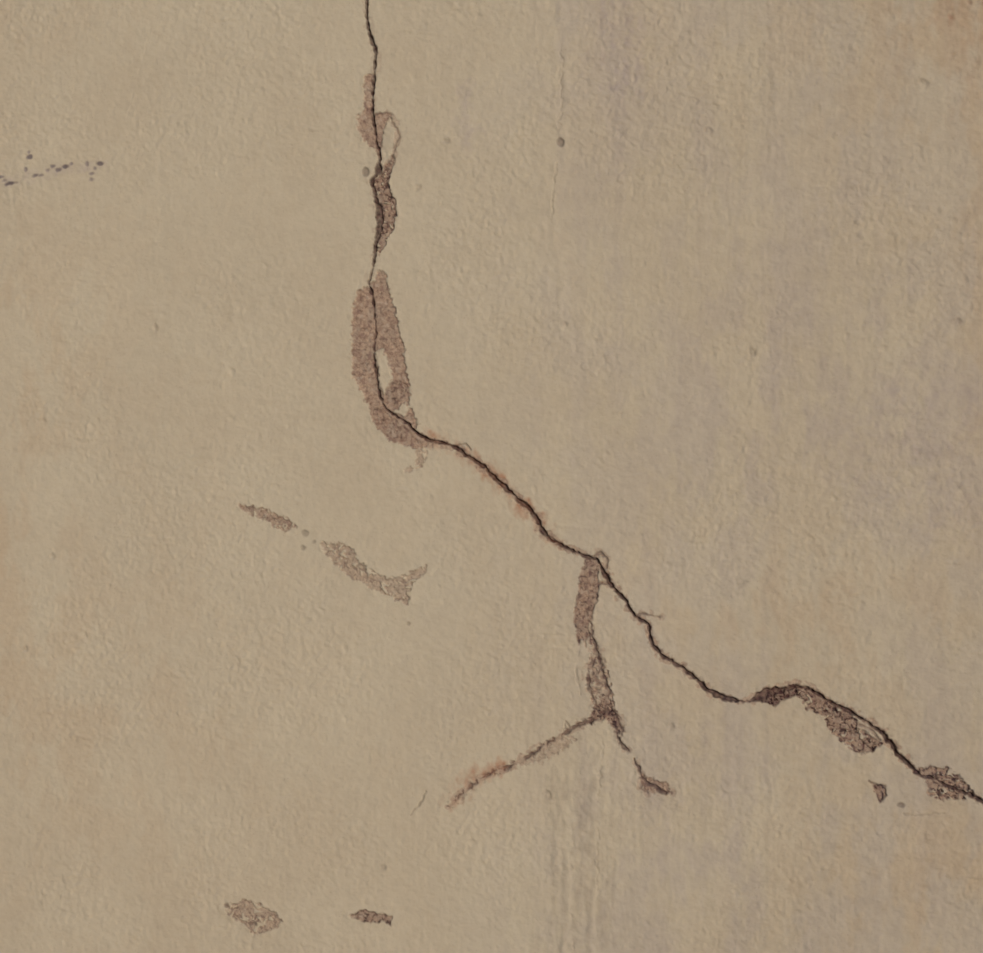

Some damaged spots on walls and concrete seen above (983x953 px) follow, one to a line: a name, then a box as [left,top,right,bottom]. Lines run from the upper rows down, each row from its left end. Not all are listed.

peeling [354,73,402,257]
spalling [348,269,429,475]
crack [360,0,983,811]
spalling [236,503,428,607]
spalling [760,691,883,757]
spalling [867,764,975,818]
peeling [223,898,284,936]
peeling [347,908,394,928]